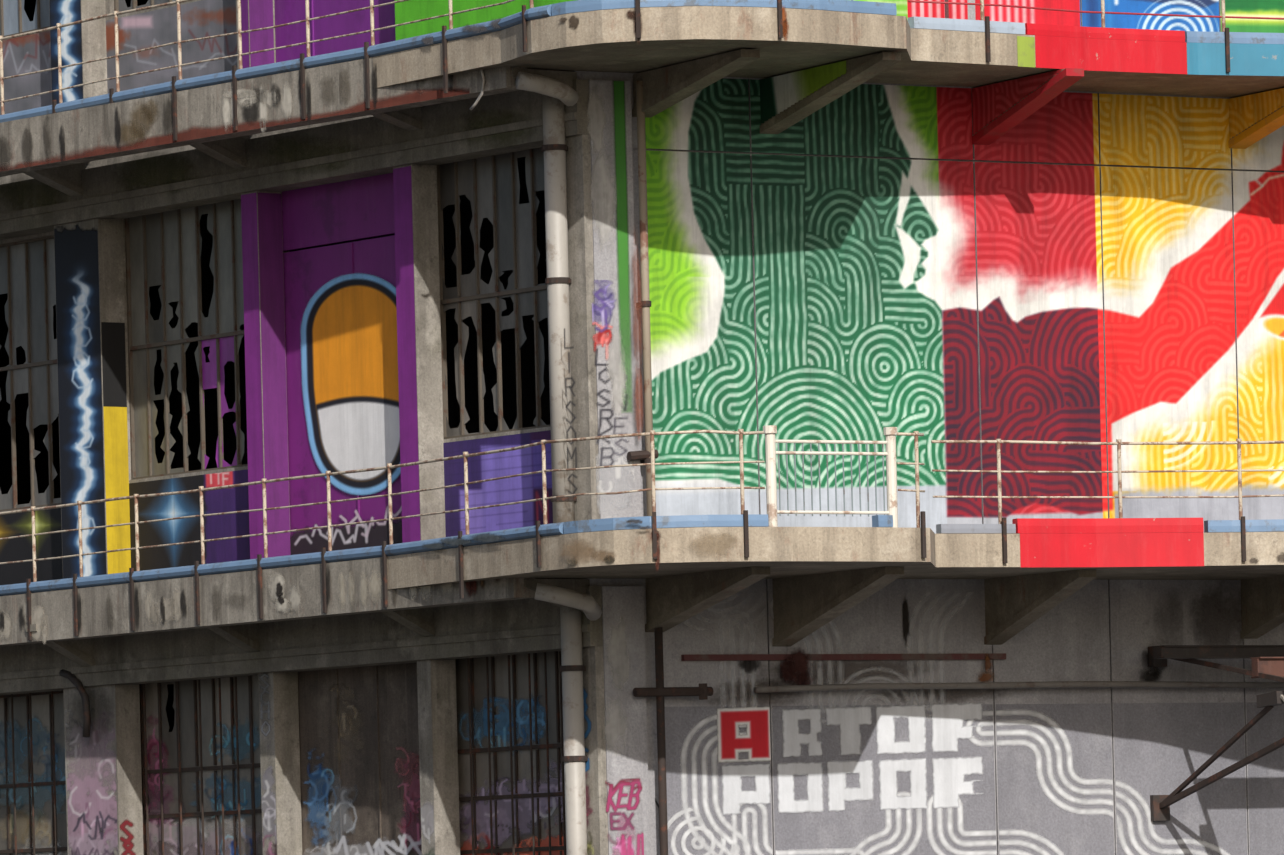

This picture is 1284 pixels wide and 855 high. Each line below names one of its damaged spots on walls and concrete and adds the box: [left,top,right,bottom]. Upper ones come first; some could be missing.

corrosion [0,89,470,172]
corrosion [780,648,812,685]